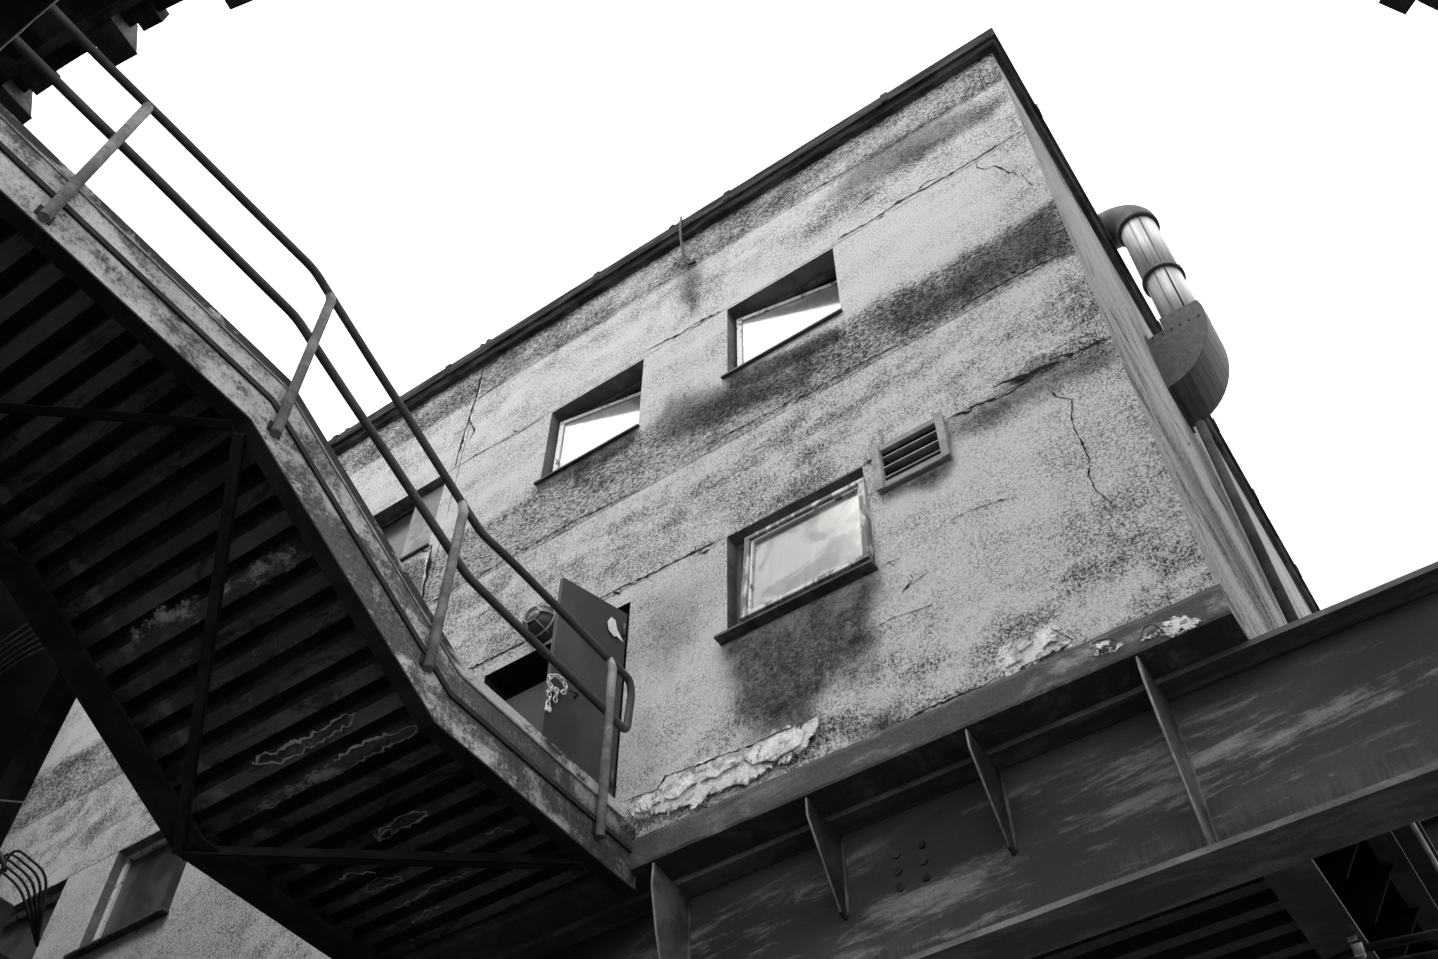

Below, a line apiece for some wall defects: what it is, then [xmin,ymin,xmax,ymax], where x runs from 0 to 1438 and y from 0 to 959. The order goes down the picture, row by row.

crack [756,72,1043,246]
leakage [885,218,1062,321]
leakage [666,330,840,435]
crack [1190,476,1277,617]
leakage [727,584,873,732]
peeling [994,615,1204,678]
peeling [620,714,823,821]